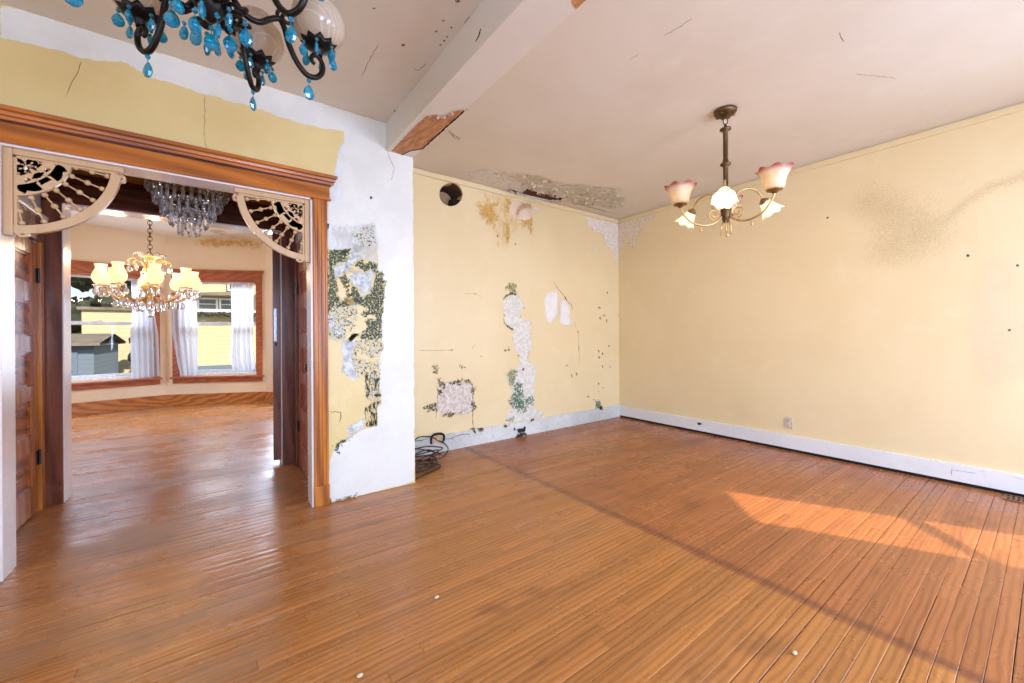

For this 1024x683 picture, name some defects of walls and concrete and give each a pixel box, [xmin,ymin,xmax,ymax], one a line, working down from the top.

damp [475,190,534,248]
peeling [465,169,660,264]
peeling [423,367,477,417]
peeling [503,283,544,438]